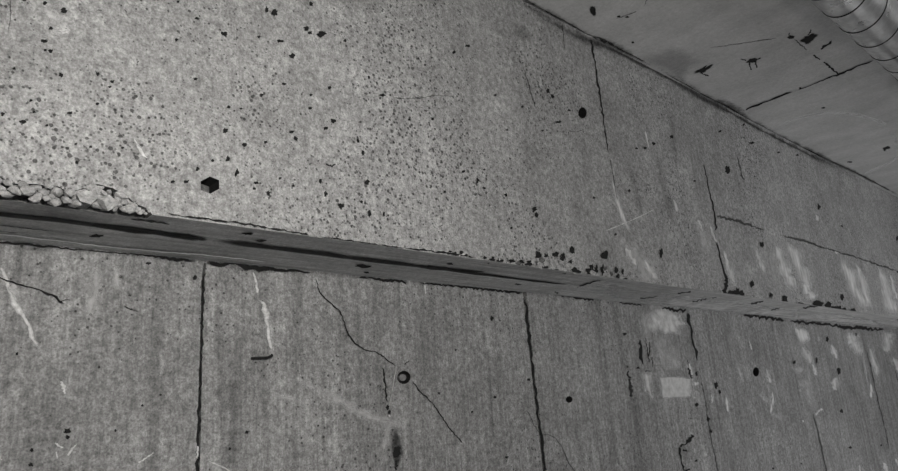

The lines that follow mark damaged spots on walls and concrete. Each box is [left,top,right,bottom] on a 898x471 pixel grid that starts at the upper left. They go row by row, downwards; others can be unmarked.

crack [527,0,643,61]
spalling [0,178,151,215]
crack [0,277,68,304]
leakage [776,236,898,375]
crack [316,280,462,443]
crack [679,434,694,471]